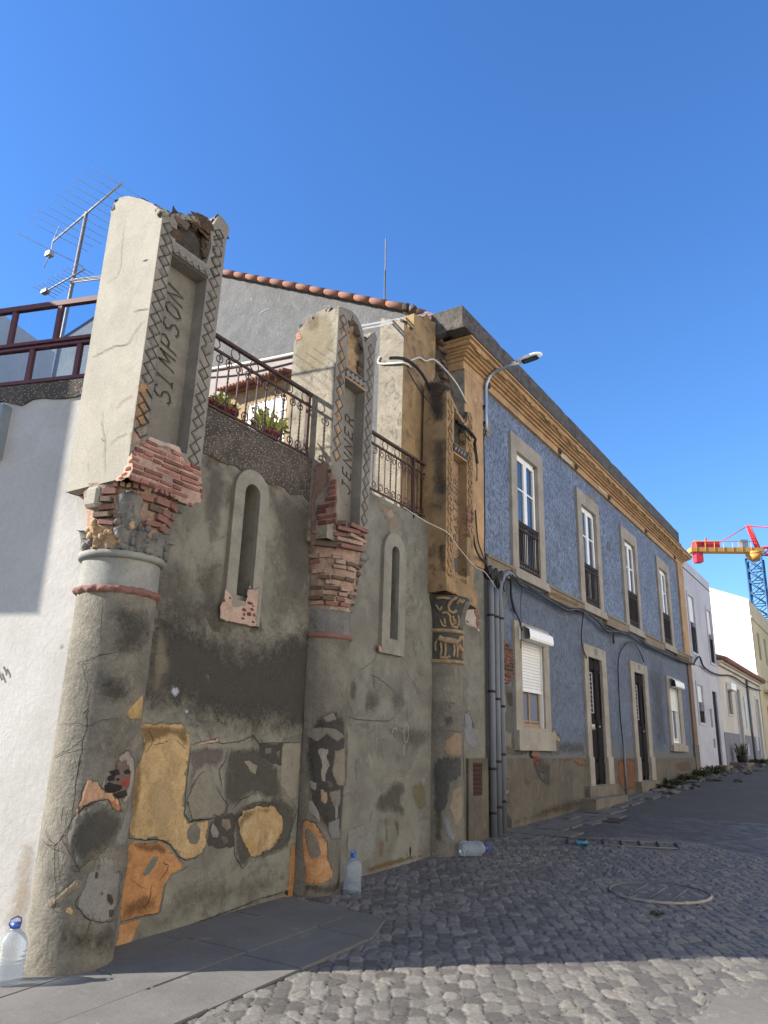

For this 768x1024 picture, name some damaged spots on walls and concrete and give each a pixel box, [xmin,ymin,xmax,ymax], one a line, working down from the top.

flaking render [116,383,203,507]
flaking render [310,461,338,547]
damp [116,567,308,736]
flaking render [220,586,259,626]
crack [44,603,119,907]
flaking render [49,687,284,946]
flaking render [284,713,345,897]
flaking render [434,710,479,842]